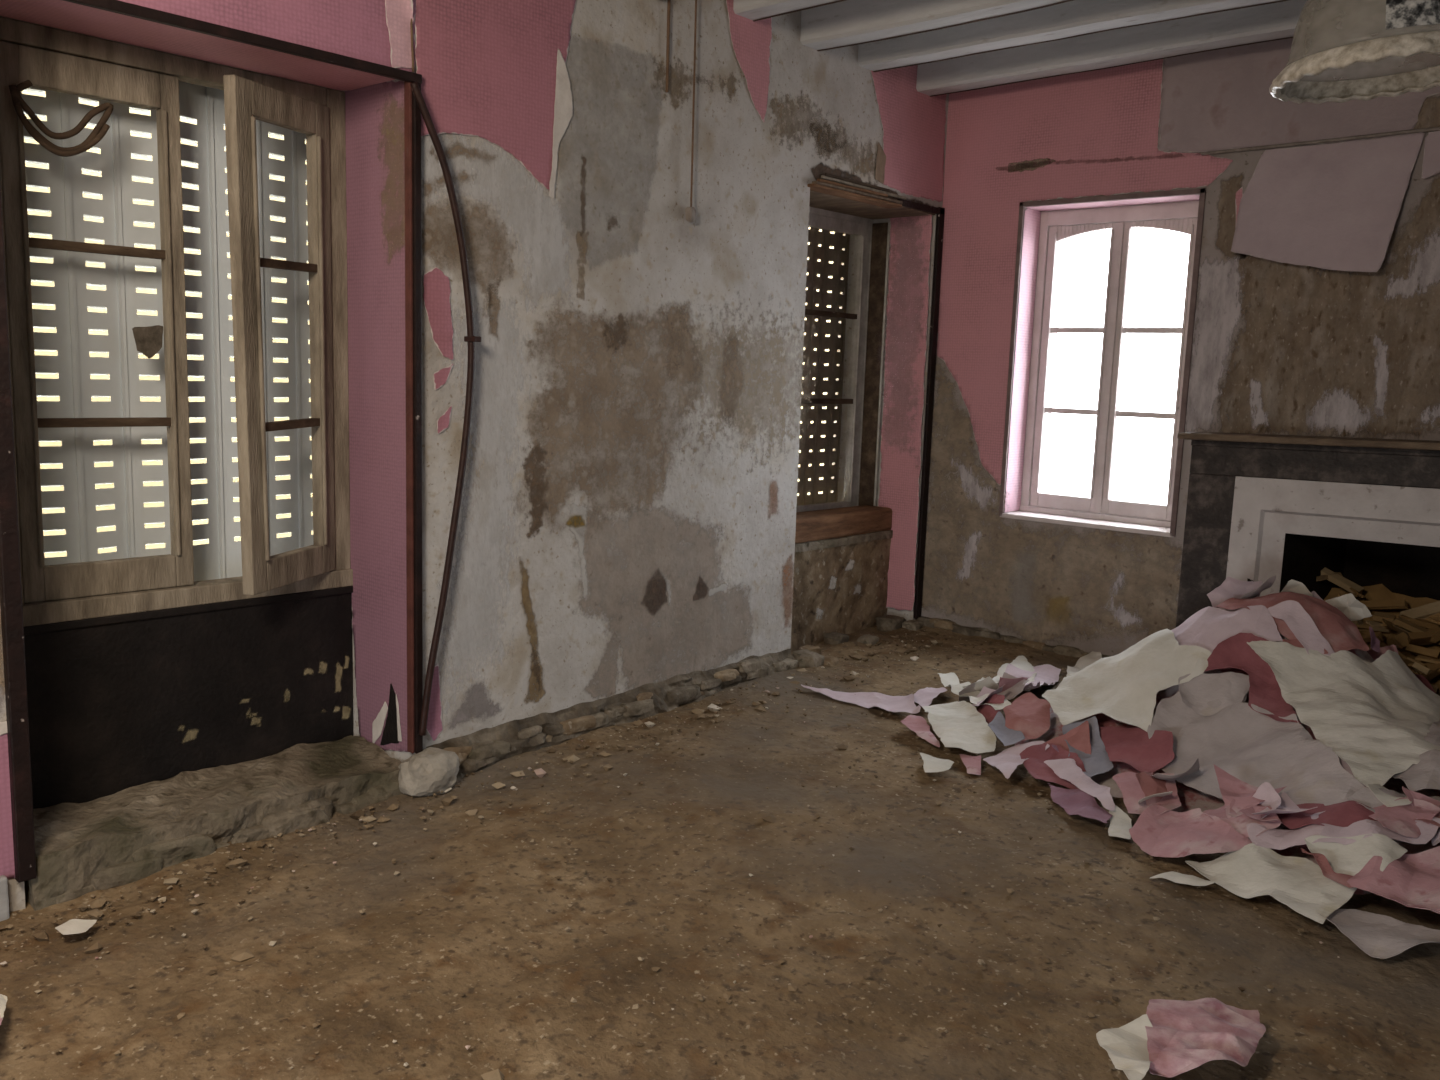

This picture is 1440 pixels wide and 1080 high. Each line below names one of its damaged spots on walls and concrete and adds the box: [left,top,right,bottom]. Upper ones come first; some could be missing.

peeling [1414,96,1440,132]
peeling [421,144,510,337]
flaking render [811,163,930,206]
peeling [1216,174,1440,438]
peeling [433,364,453,390]
leakage [667,307,809,466]
peeling [518,303,752,698]
flaking render [791,530,893,652]
peeling [426,665,500,741]